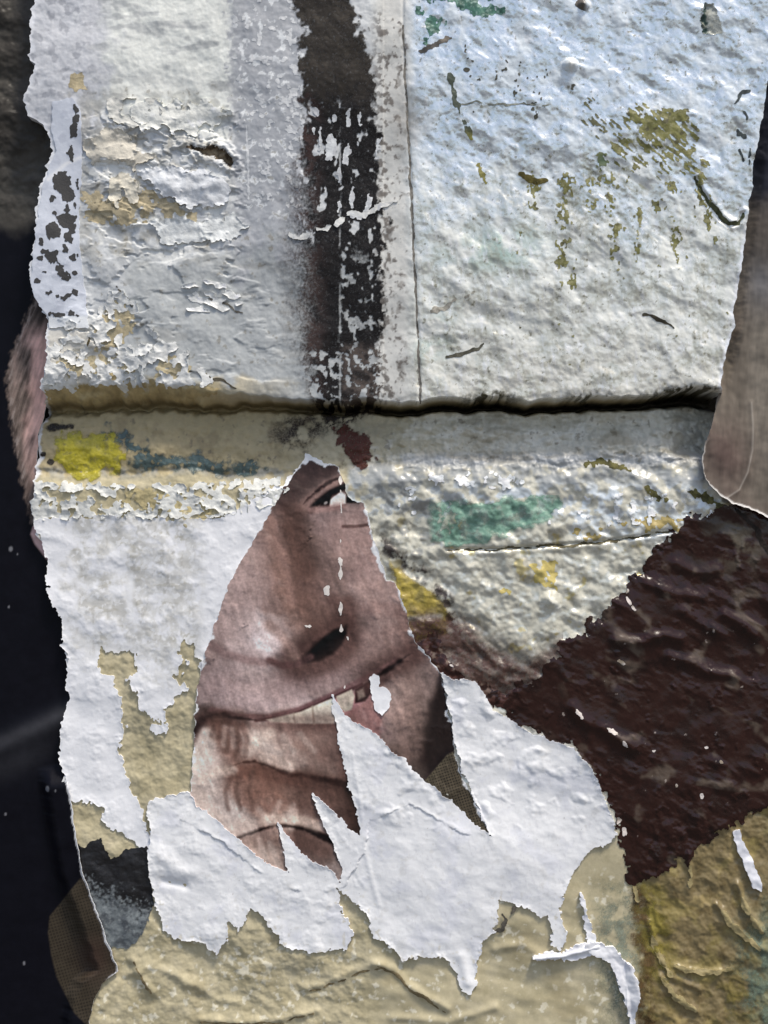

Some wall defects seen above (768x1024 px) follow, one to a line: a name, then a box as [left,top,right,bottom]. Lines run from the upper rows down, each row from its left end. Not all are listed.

peeling [288,186,398,240]
peeling [181,280,243,312]
peeling [42,290,219,409]
peeling [30,476,290,521]
peeling [369,674,391,715]
peeling [532,892,641,1024]